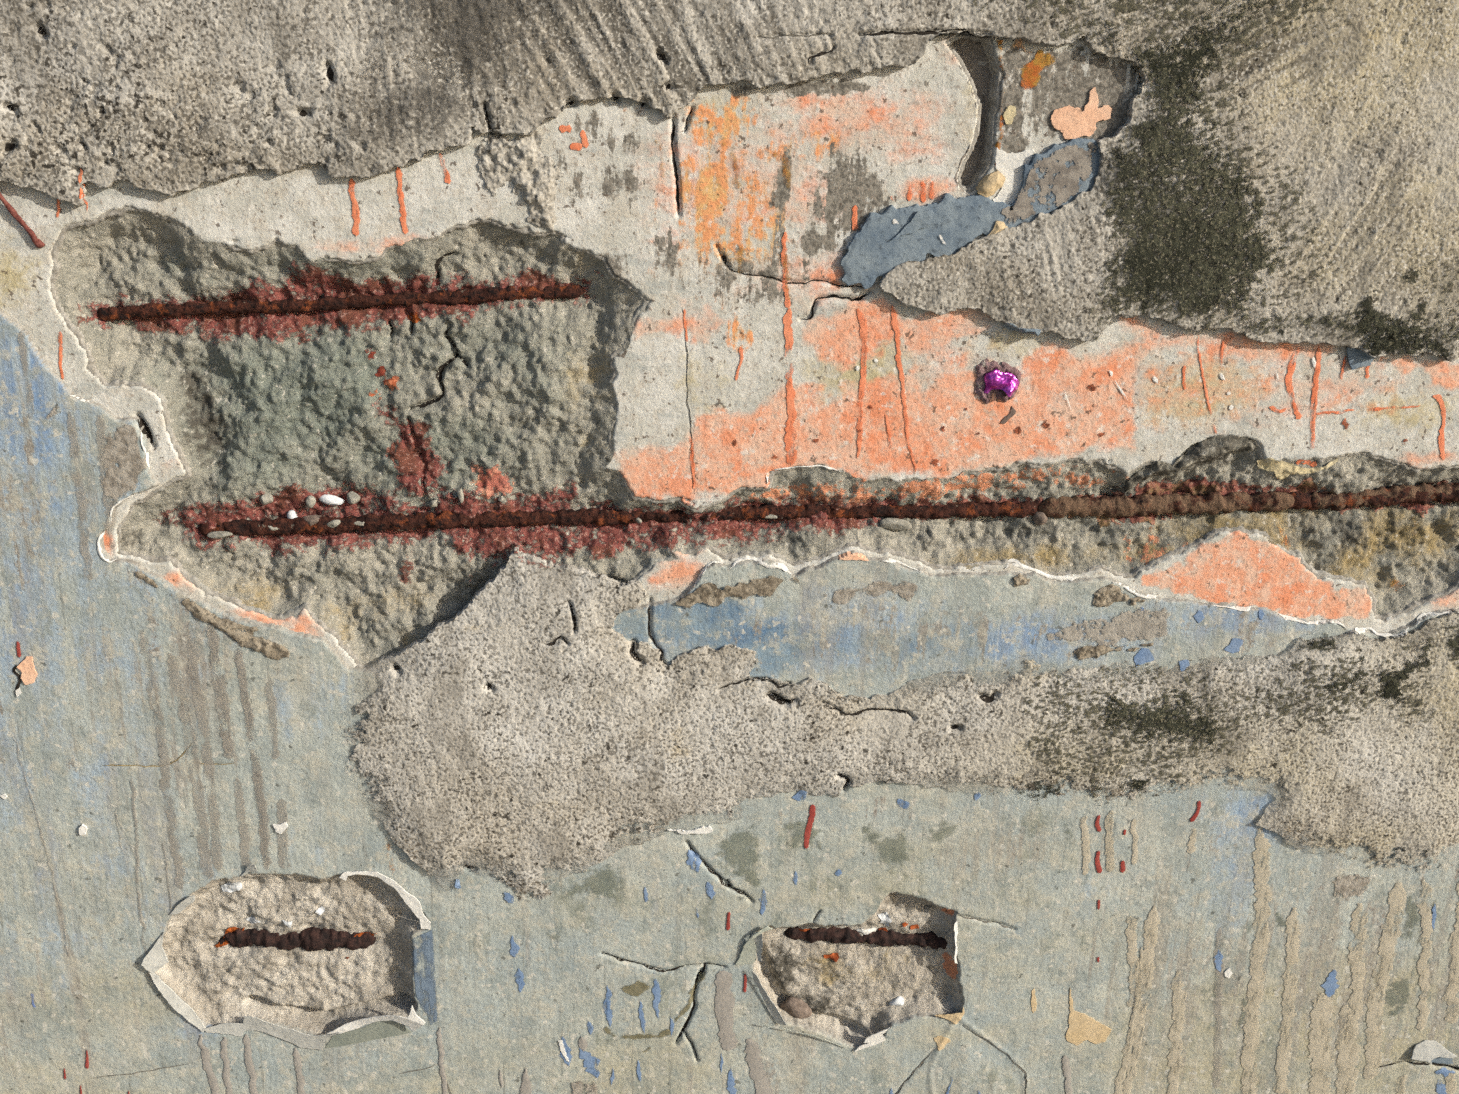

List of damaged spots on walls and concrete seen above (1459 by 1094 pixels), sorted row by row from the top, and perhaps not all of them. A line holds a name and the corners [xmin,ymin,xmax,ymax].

leakage [973,0,1459,360]
peeling [0,31,1459,672]
corrosion [77,260,1043,584]
corrosion [1068,475,1456,528]
peeling [13,656,38,697]
crack [720,677,910,716]
peeling [667,825,716,899]
corrosion [215,927,245,948]
spalling [141,864,437,1050]
crack [602,953,721,1057]
spalling [736,889,965,1052]